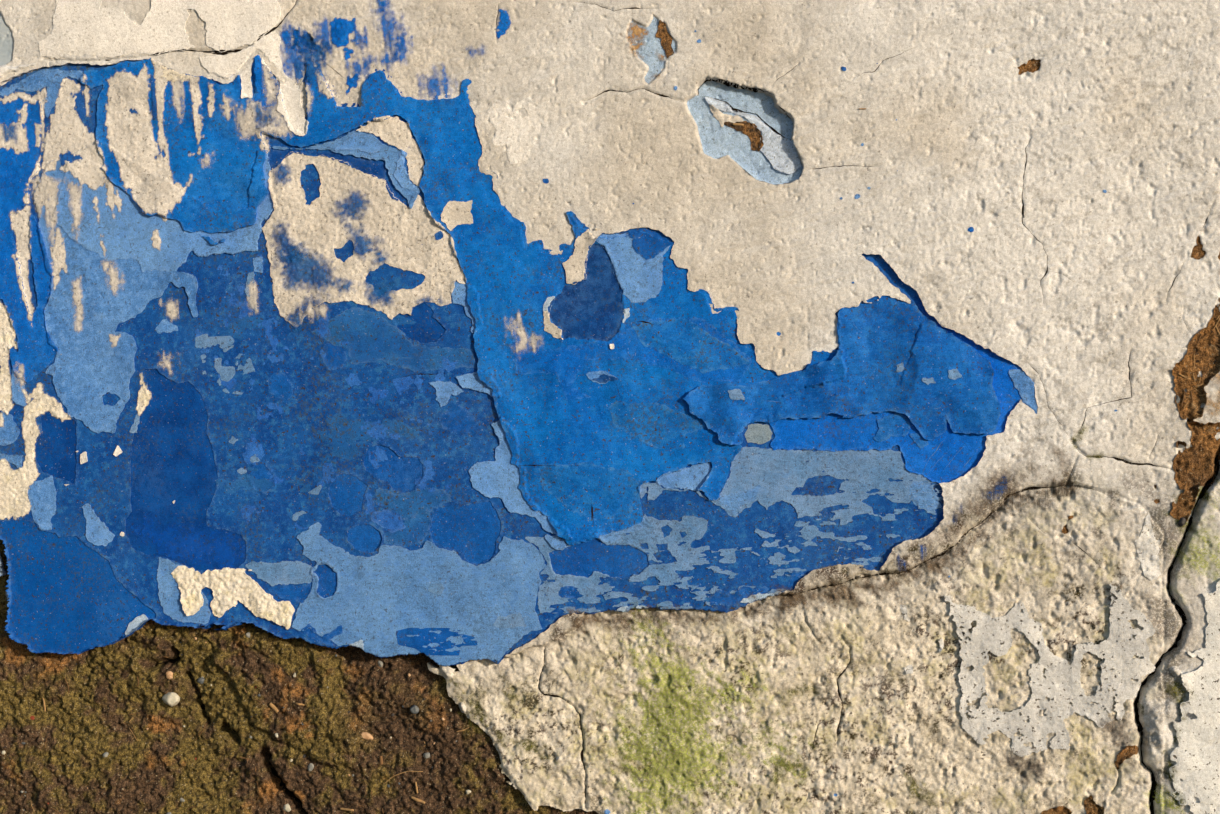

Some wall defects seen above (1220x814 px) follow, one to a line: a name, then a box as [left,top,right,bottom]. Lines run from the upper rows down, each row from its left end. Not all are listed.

crack [153,0,346,80]
peeling [0,0,1041,671]
crack [796,347,1173,636]
spalling [1135,304,1220,581]
spalling [1191,236,1220,260]
spalling [0,539,599,814]
crack [538,649,586,803]
crack [809,641,851,752]
crack [1116,450,1220,814]